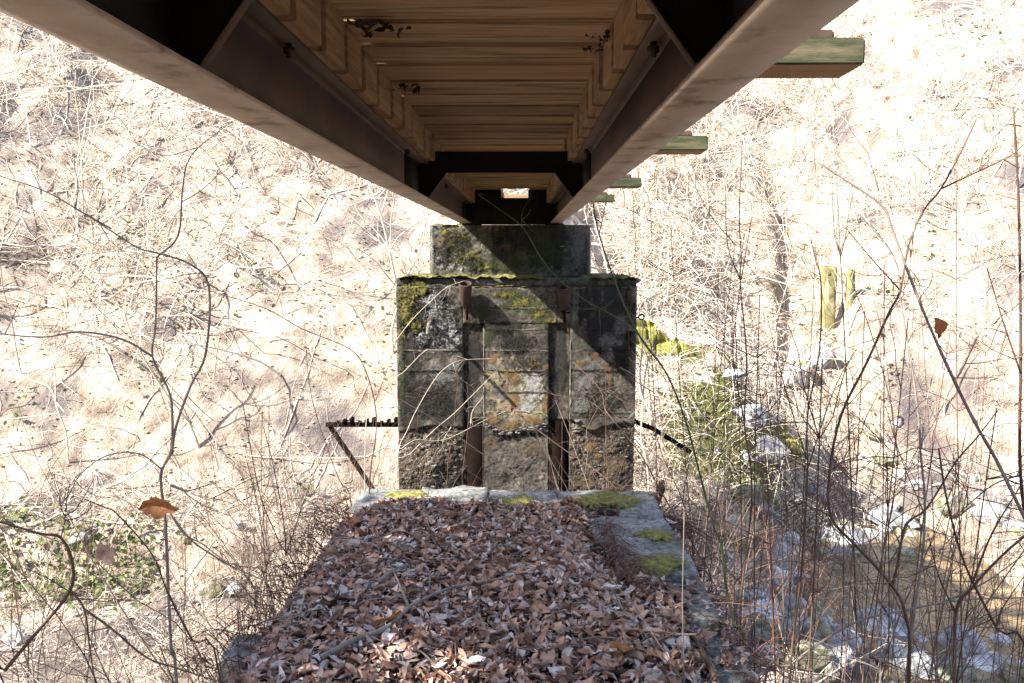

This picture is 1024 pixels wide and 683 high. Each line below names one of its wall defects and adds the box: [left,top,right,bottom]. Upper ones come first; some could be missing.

leakage [429,226,466,271]
peeling [413,287,462,354]
leakage [397,278,635,433]
rust [485,368,548,430]